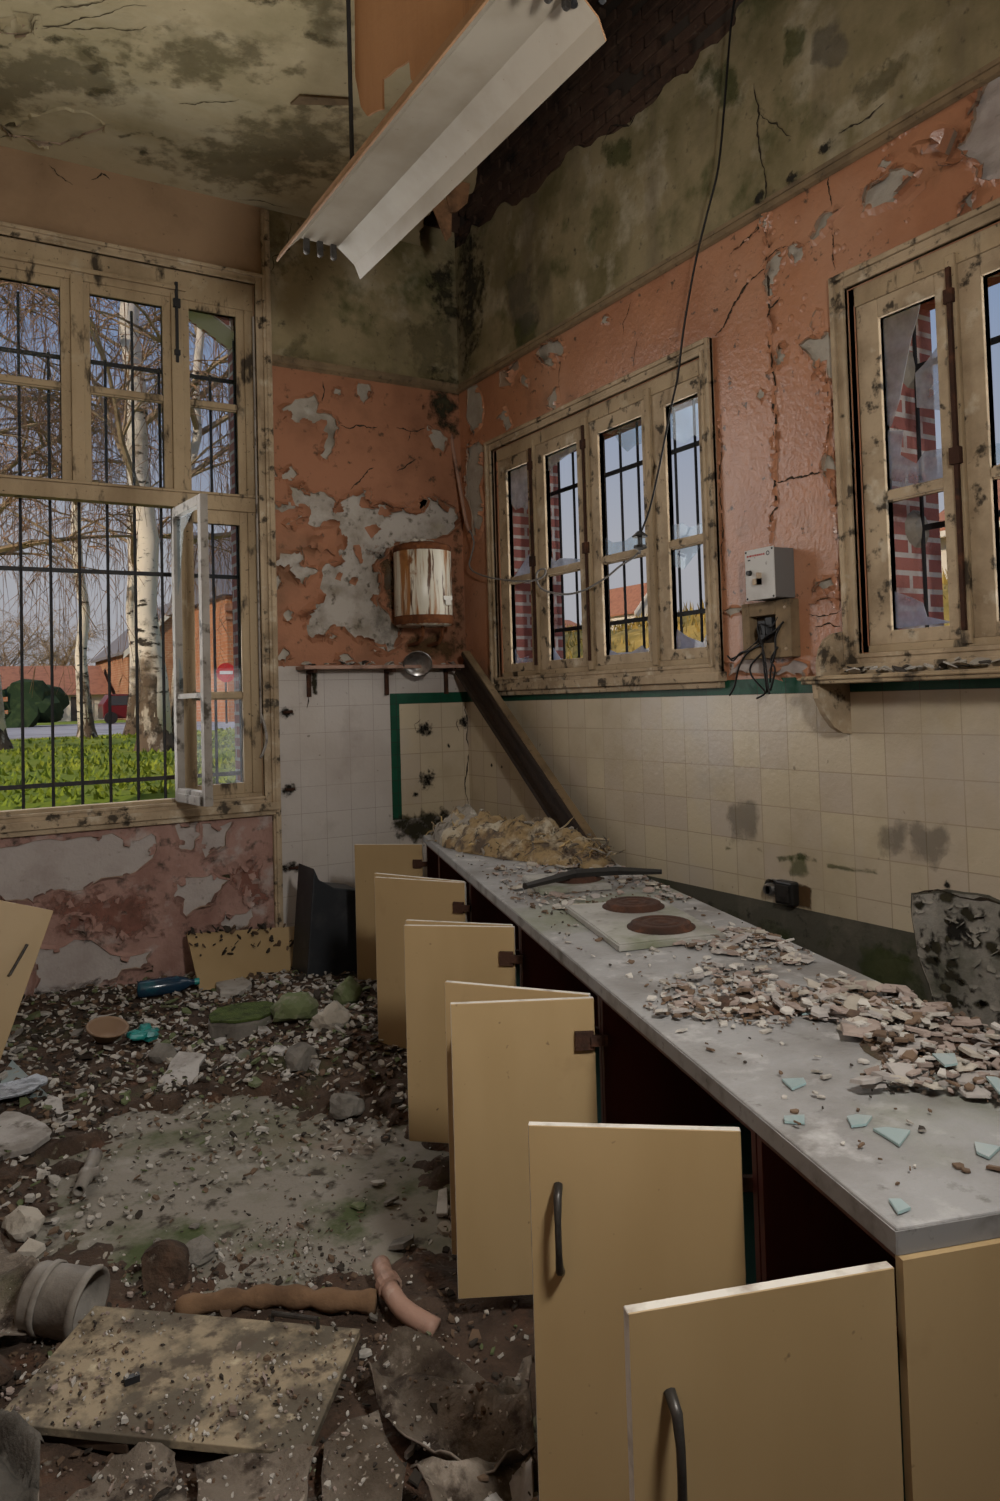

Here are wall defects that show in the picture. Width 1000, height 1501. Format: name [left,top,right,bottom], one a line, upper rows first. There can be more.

crack [33,0,145,31]
flaking render [456,0,739,247]
peeling [758,76,1000,306]
crack [716,90,841,627]
peeling [772,327,832,388]
peeling [274,335,567,667]
peeling [0,819,256,998]